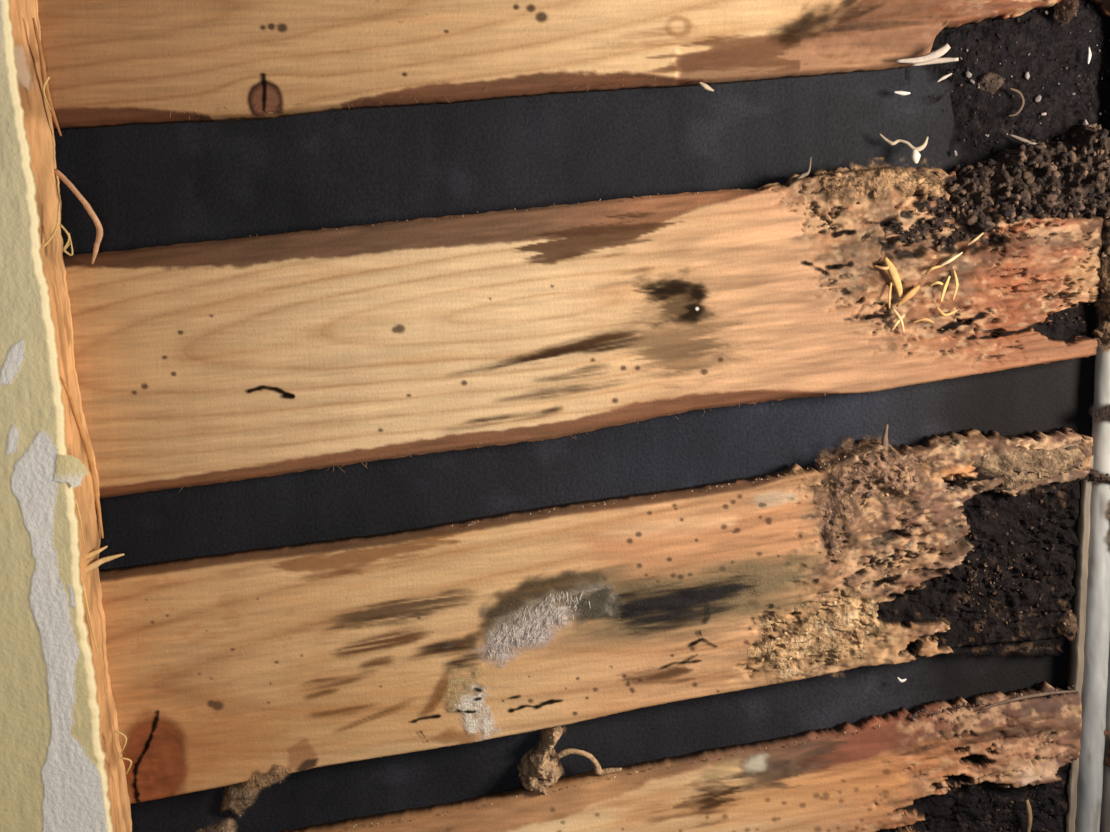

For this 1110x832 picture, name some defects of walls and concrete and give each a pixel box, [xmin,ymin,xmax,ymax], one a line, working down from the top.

spalling [876,177,1004,266]
water stain [491,332,629,368]
water stain [645,280,714,326]
spalling [1031,302,1096,343]
water stain [528,385,589,412]
spalling [876,479,1080,656]
peeling [7,425,108,832]
crack [132,710,159,802]
water stain [310,678,357,697]
water stain [318,705,403,728]
water stain [342,563,809,739]
spalling [876,748,1071,832]